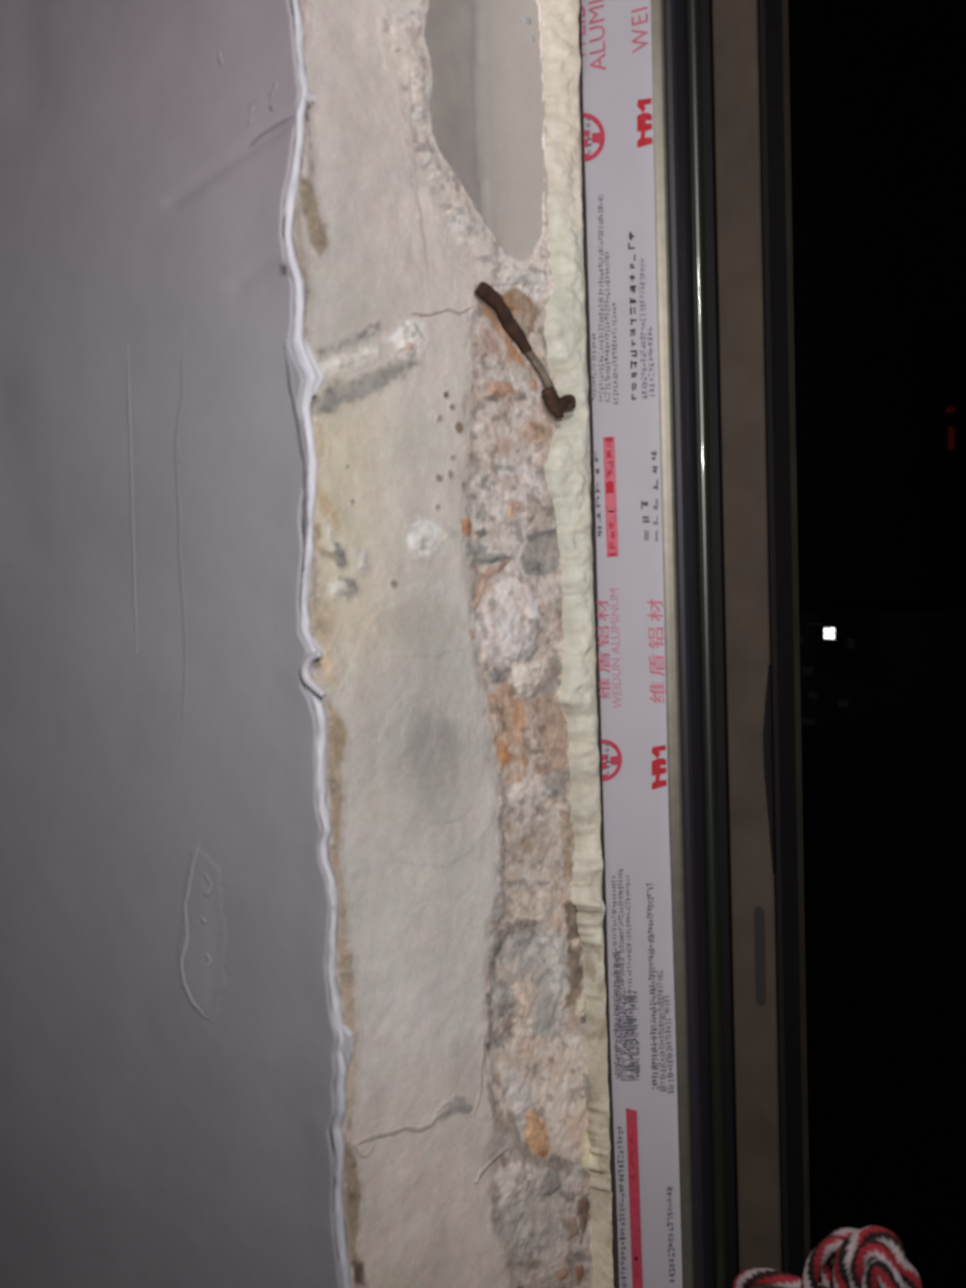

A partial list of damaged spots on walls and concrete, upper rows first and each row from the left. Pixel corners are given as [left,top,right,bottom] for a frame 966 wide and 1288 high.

rust [471,285,525,369]
spalling [376,0,594,1288]
crack [353,1025,487,1158]